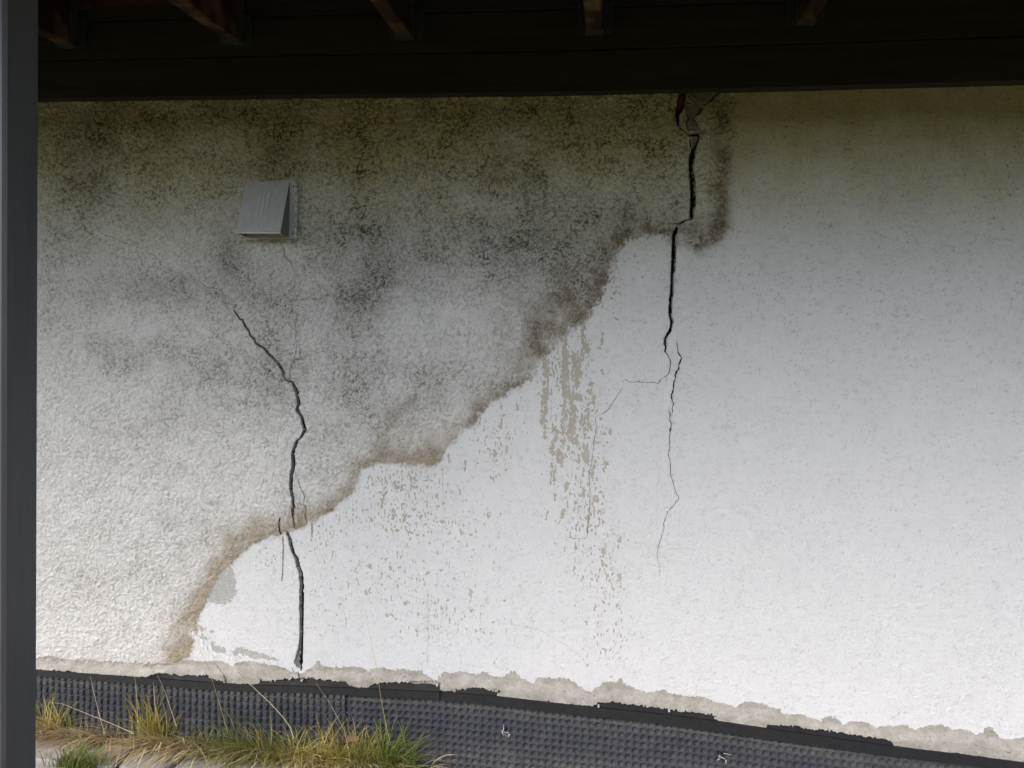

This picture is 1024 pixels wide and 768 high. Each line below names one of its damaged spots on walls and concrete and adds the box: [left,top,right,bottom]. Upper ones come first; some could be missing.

crack [98,229,307,682]
water stain [166,514,313,662]
peeling [207,402,528,648]
peeling [537,255,641,678]
water stain [524,225,669,356]
crack [568,136,700,577]